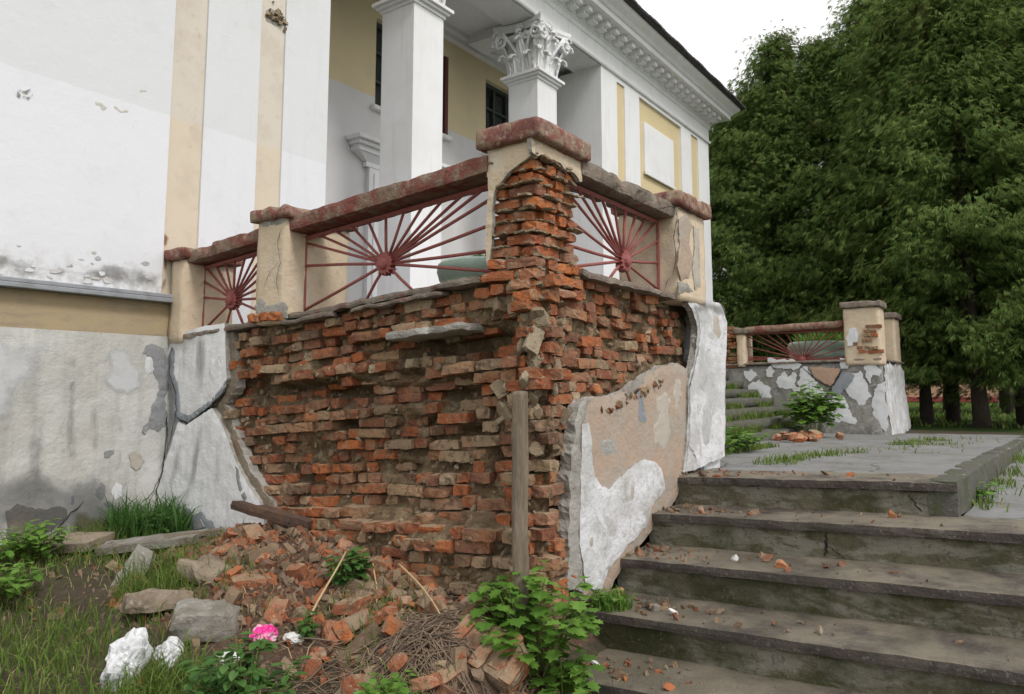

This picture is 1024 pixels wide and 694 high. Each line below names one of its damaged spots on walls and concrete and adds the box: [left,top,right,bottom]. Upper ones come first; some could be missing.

peeling [47,251,121,285]
peeling [677,214,701,294]
crack [141,346,228,502]
flaking render [223,156,682,616]
peeling [653,308,712,449]
peeling [744,324,911,435]
crack [823,532,844,559]